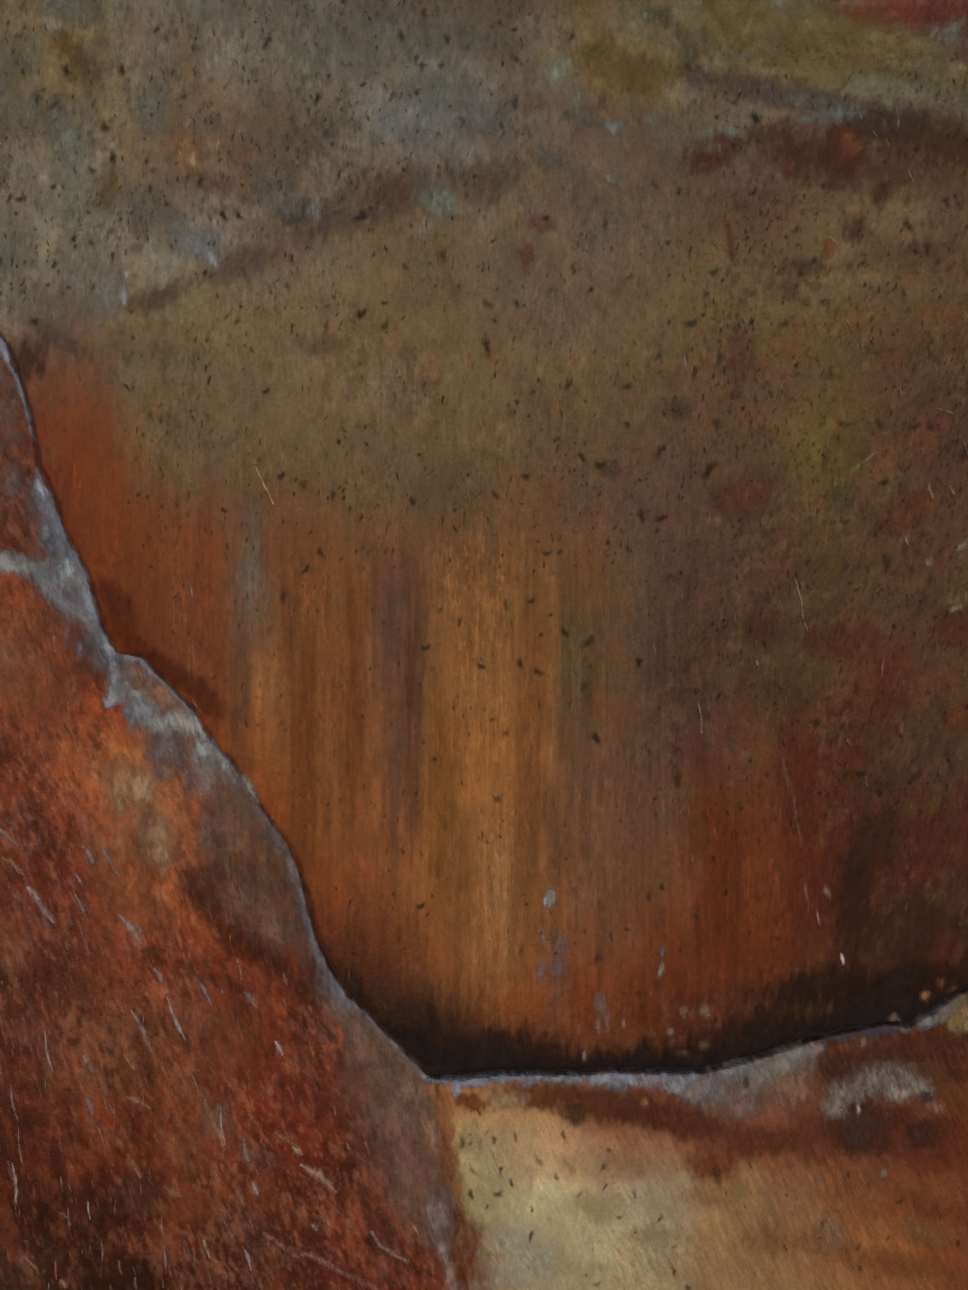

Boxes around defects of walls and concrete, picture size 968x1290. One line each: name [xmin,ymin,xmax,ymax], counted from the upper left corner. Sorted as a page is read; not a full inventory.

crack [0,332,274,822]
water stain [0,465,968,1249]
corrosion [435,1094,497,1290]
crack [297,859,968,1142]
corrosion [512,1084,836,1184]